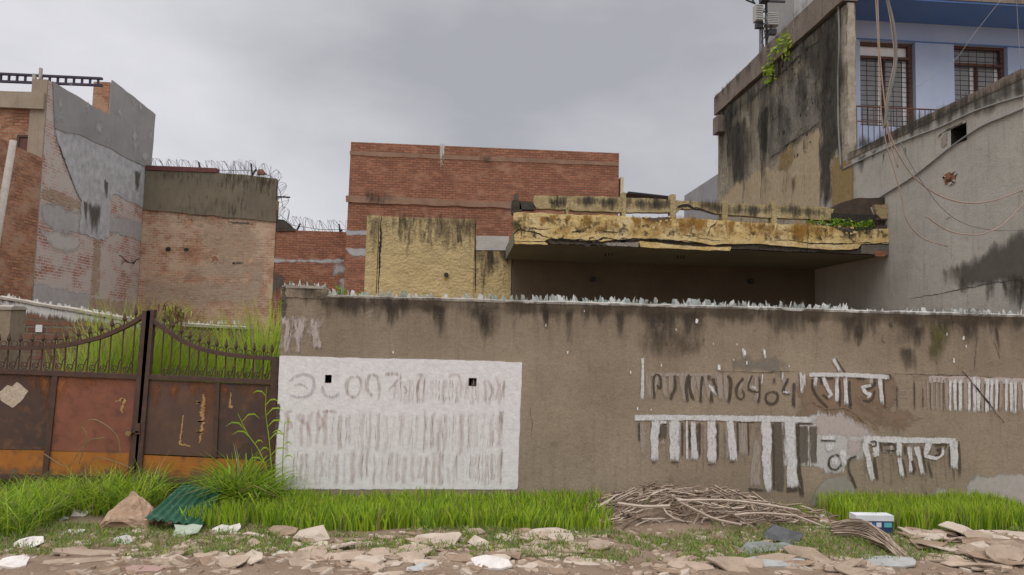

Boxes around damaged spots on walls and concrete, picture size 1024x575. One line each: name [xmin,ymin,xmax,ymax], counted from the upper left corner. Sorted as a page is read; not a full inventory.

leakage [719,14,843,216]
spalling [942,170,957,185]
peeling [32,99,152,318]
leakage [84,202,100,228]
leakage [544,198,654,236]
crack [513,195,721,244]
leakage [735,205,888,243]
crack [376,217,384,293]
leakage [959,232,1024,300]
crack [911,280,1022,301]
leakage [617,306,707,347]
leakage [844,313,983,354]